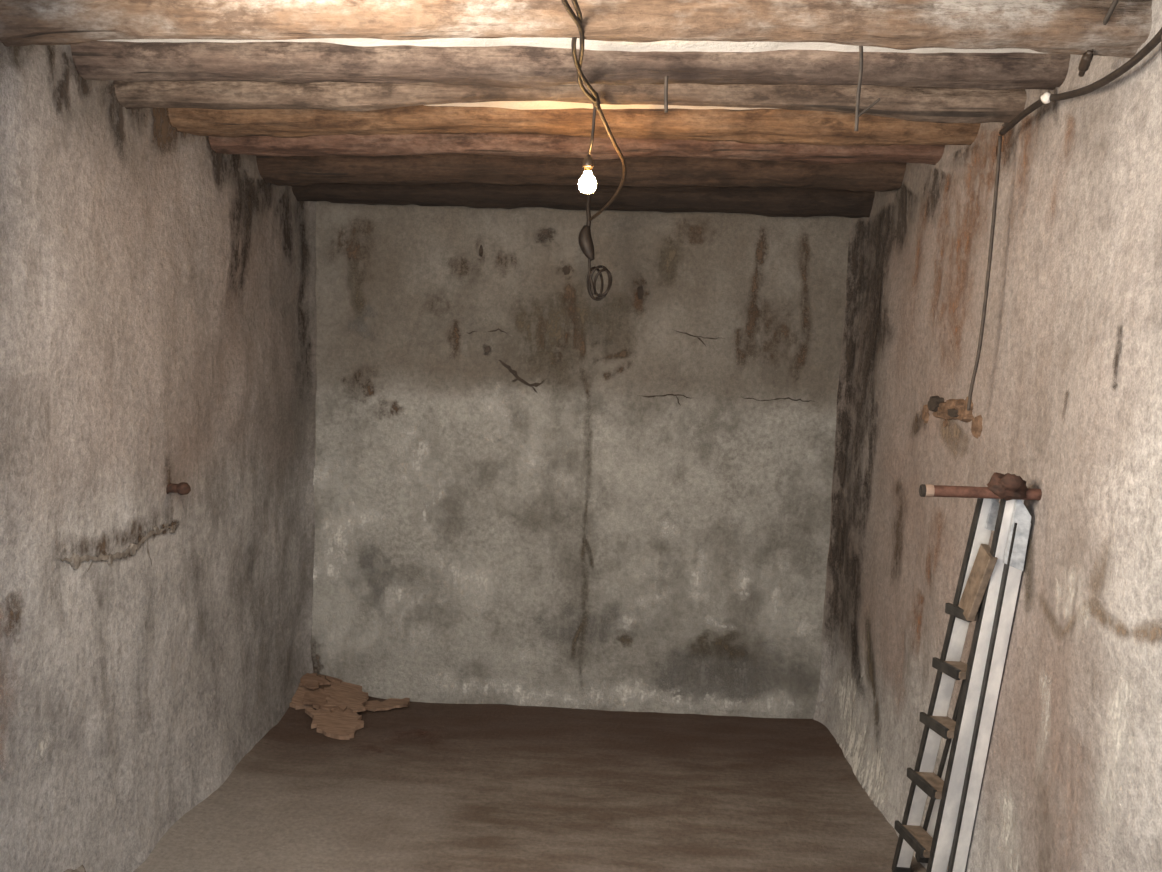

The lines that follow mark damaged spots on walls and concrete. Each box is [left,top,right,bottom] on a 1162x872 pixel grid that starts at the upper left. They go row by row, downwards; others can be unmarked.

water stain [207,137,310,377]
water stain [343,372,400,415]
crack [468,328,547,393]
water stain [515,284,640,384]
crack [639,394,689,404]
crack [674,330,719,346]
water stain [736,229,807,369]
crack [742,396,819,404]
water stain [827,169,945,736]
crack [572,502,593,672]
water stain [1043,565,1162,642]
water stain [591,619,793,709]